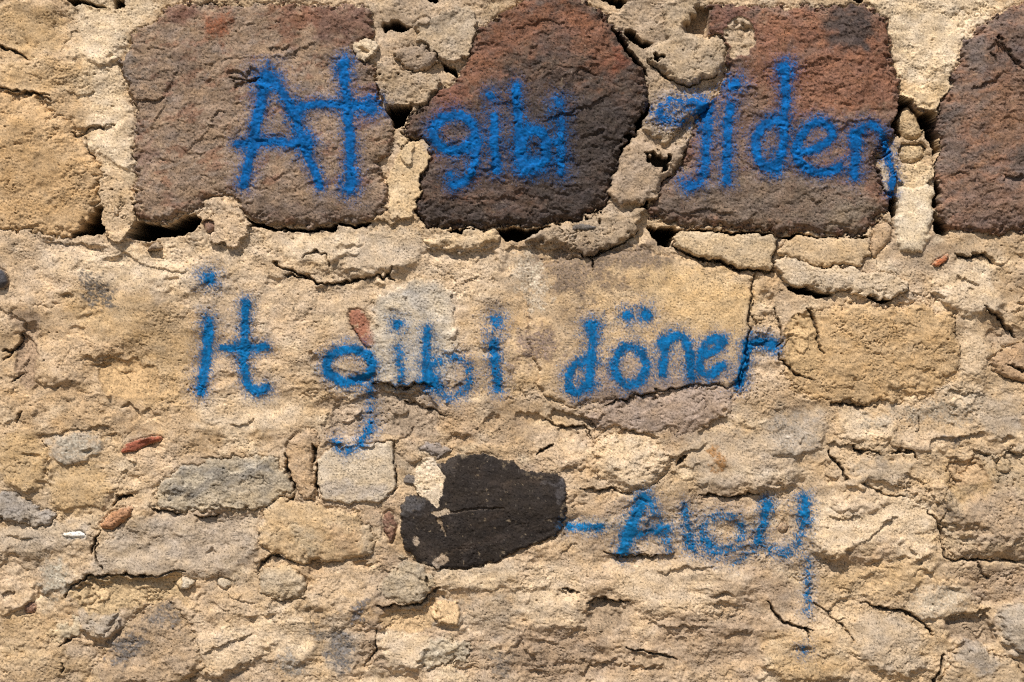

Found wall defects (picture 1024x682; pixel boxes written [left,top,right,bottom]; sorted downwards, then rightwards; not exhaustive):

crack [770,605,847,636]
crack [872,605,930,631]